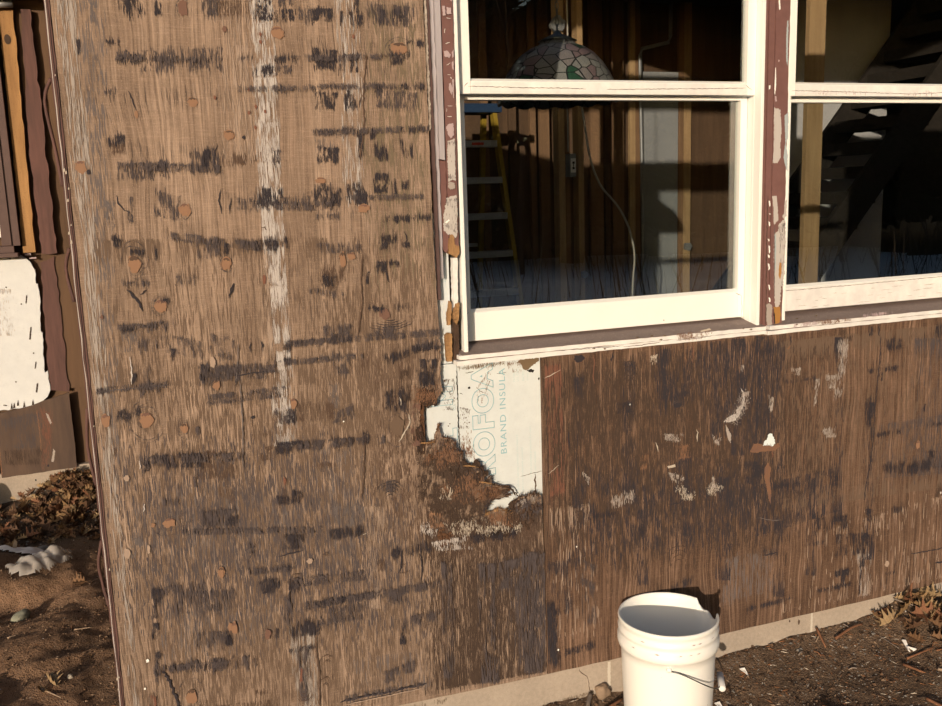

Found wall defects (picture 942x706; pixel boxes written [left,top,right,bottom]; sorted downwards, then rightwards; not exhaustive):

peeling [769,21,789,170]
peeling [443,123,458,238]
peeling [766,196,787,326]